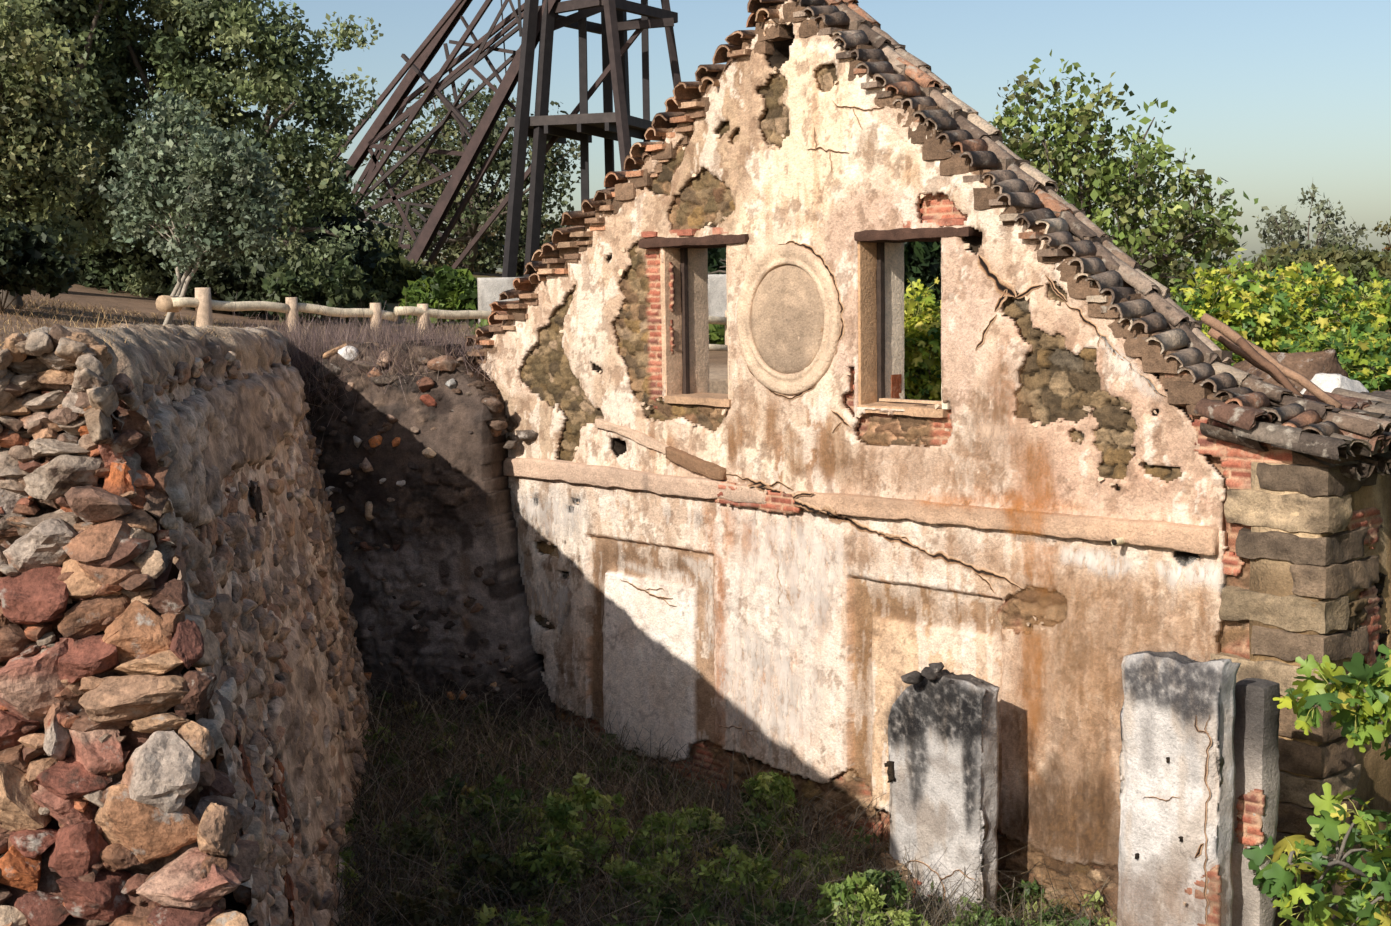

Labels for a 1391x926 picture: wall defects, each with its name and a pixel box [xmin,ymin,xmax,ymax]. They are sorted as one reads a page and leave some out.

spalling [758,22,795,149]
spalling [817,64,839,92]
spalling [643,128,735,230]
spalling [517,286,604,461]
spalling [604,243,730,432]
spalling [981,293,1182,490]
crack [777,565,792,606]
crack [726,474,1026,594]
spalling [997,586,1067,635]
spalling [557,709,941,915]
leakage [907,723,925,802]
leakage [963,705,976,822]